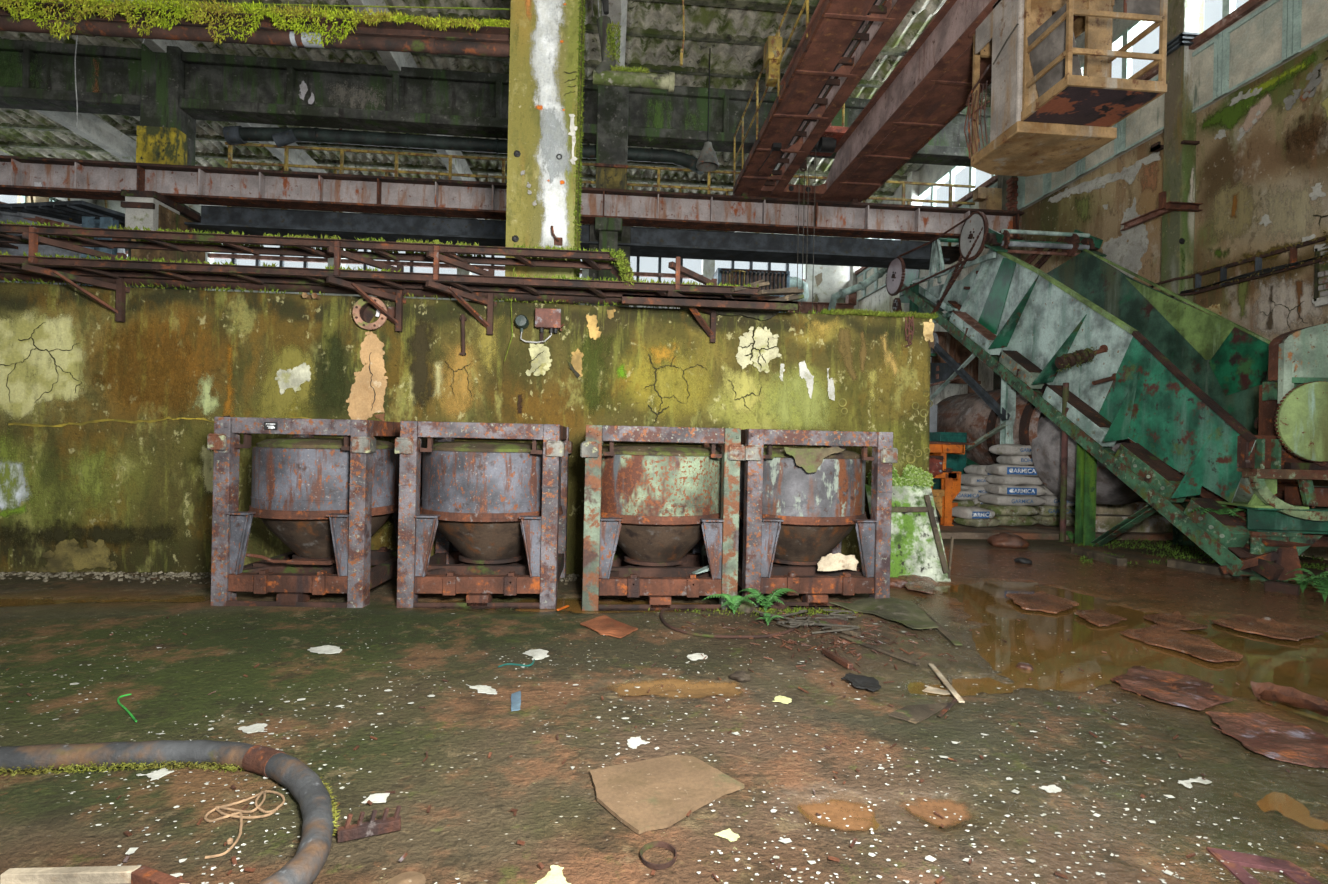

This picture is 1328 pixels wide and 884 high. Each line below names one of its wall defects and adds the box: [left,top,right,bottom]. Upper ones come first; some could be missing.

peeling [568,114,578,165]
peeling [1214,87,1262,141]
peeling [1283,63,1323,111]
crack [0,322,82,402]
peeling [275,363,311,395]
flaking render [346,331,388,421]
leakage [407,320,434,407]
flaking render [735,327,785,378]
leakage [0,462,175,547]